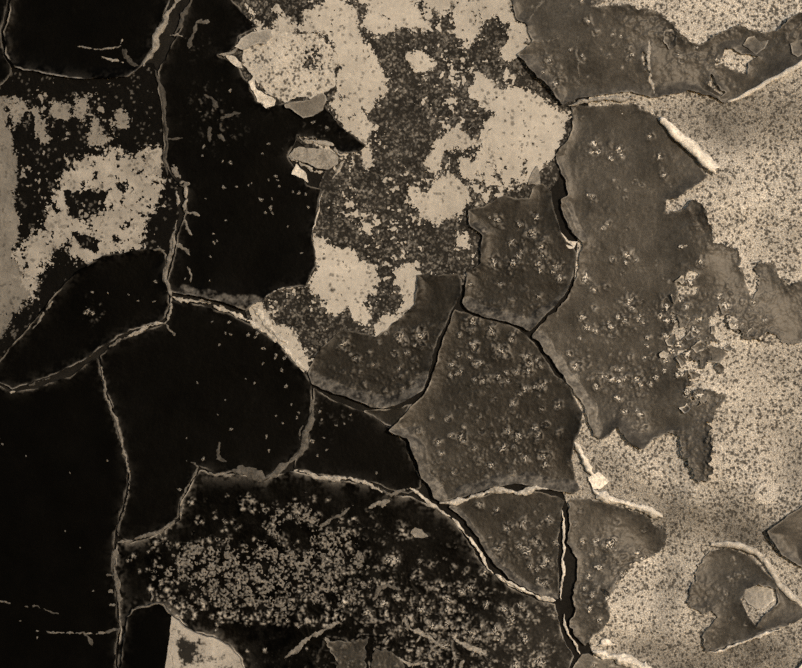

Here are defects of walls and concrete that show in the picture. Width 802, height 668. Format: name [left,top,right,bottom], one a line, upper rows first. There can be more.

crack [32,301,53,329]
crack [78,0,305,370]
spalling [0,0,577,668]
spalling [294,0,802,668]
crack [525,36,580,88]
crack [646,40,655,93]
crack [0,366,580,668]